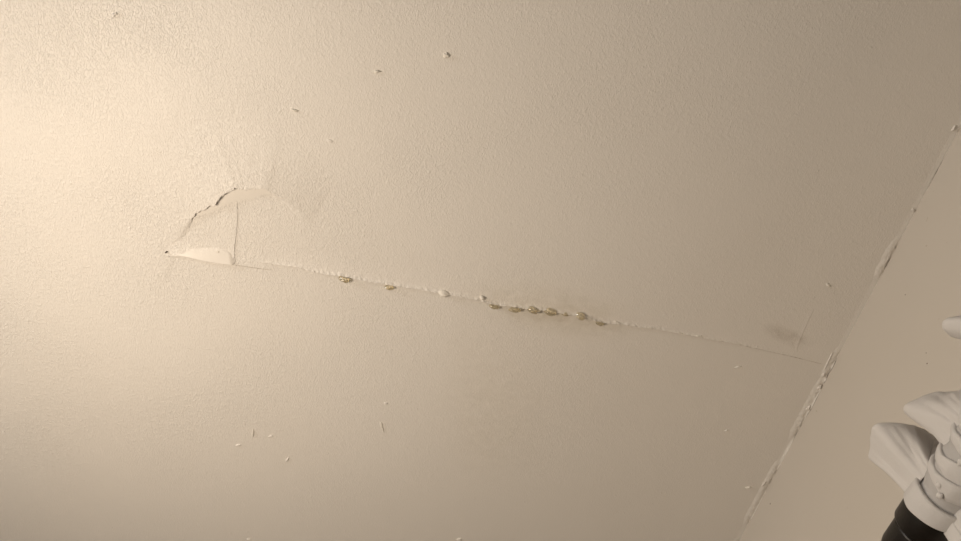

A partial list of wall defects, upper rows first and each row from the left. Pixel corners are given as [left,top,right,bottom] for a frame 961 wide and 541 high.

crack [165,116,961,541]